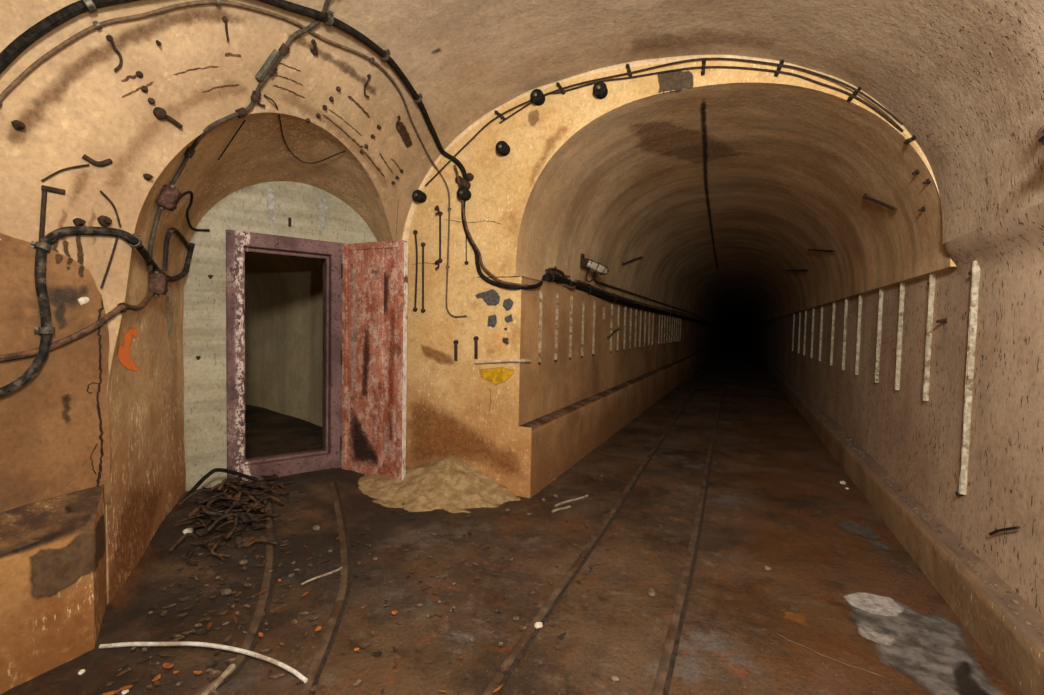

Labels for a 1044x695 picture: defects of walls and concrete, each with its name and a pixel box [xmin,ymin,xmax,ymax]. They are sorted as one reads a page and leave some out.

rust [384,275,394,438]